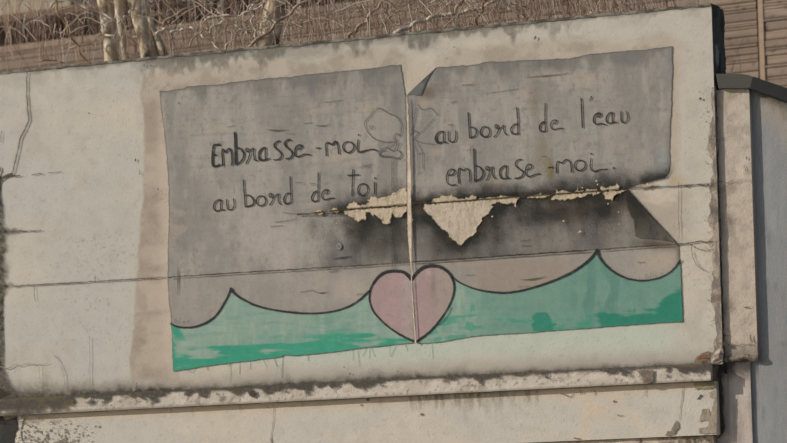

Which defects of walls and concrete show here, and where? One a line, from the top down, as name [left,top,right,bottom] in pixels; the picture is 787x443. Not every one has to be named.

crack [0,73,61,181]
peeling [310,188,413,224]
peeling [423,180,626,245]
leakage [0,171,714,420]
leakage [722,360,751,372]
peeling [0,415,101,443]
spalling [697,390,717,434]